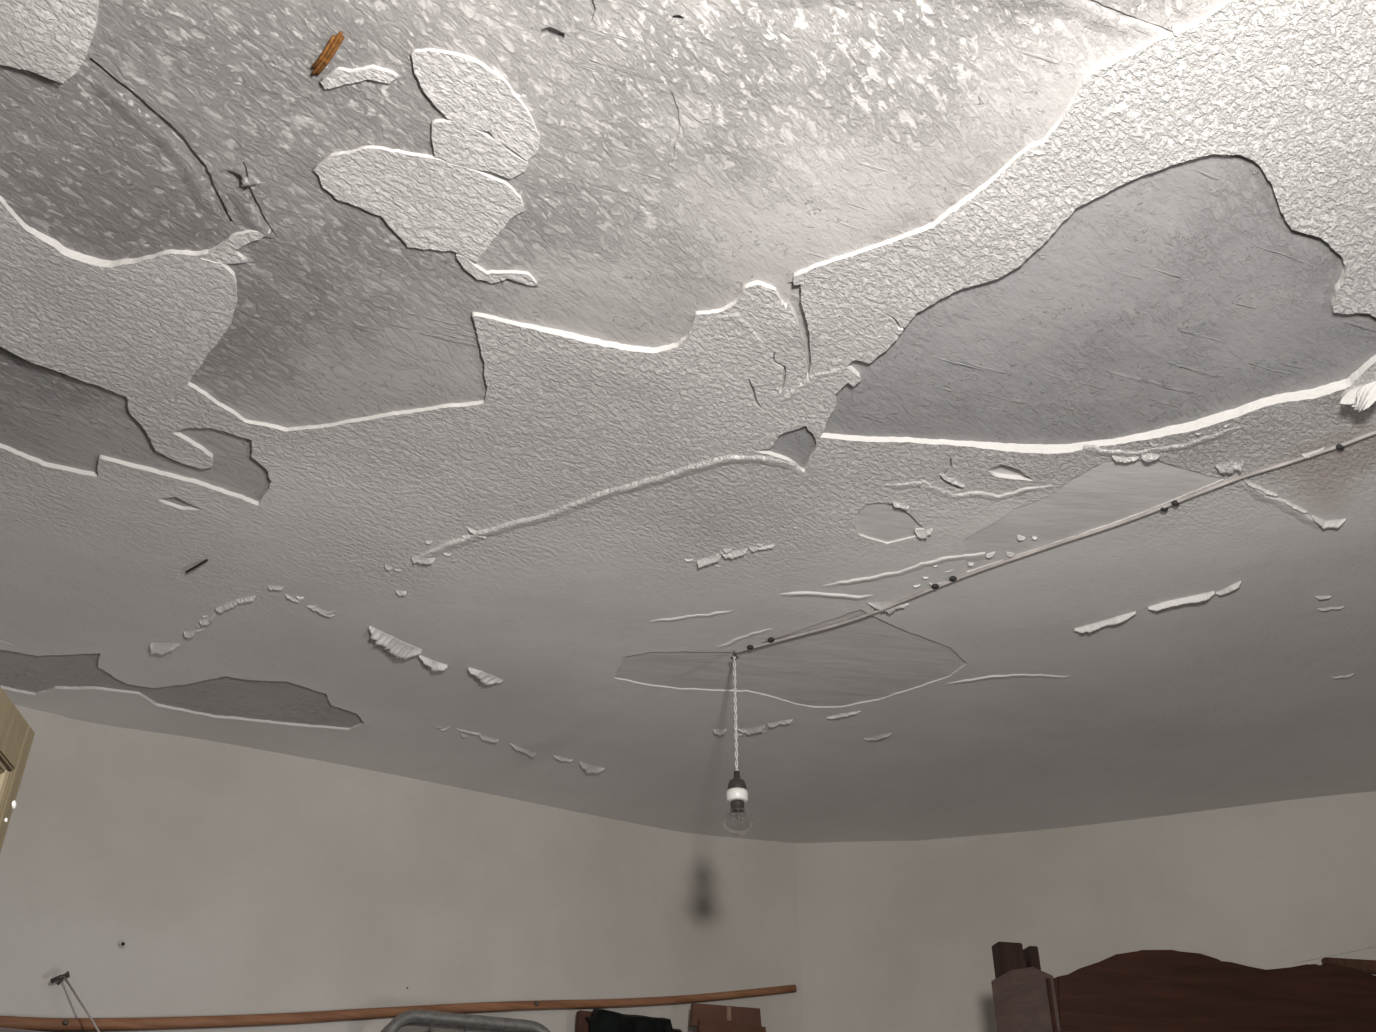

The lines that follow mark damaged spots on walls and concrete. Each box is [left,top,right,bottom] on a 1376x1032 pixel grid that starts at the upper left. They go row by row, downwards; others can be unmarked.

crack [588,0,596,24]
corrosion [310,31,345,76]
crack [670,93,680,165]
peeling [0,0,1232,506]
peeling [385,154,1376,737]
peeling [157,497,201,510]
peeling [369,626,448,671]
peeling [0,650,365,730]